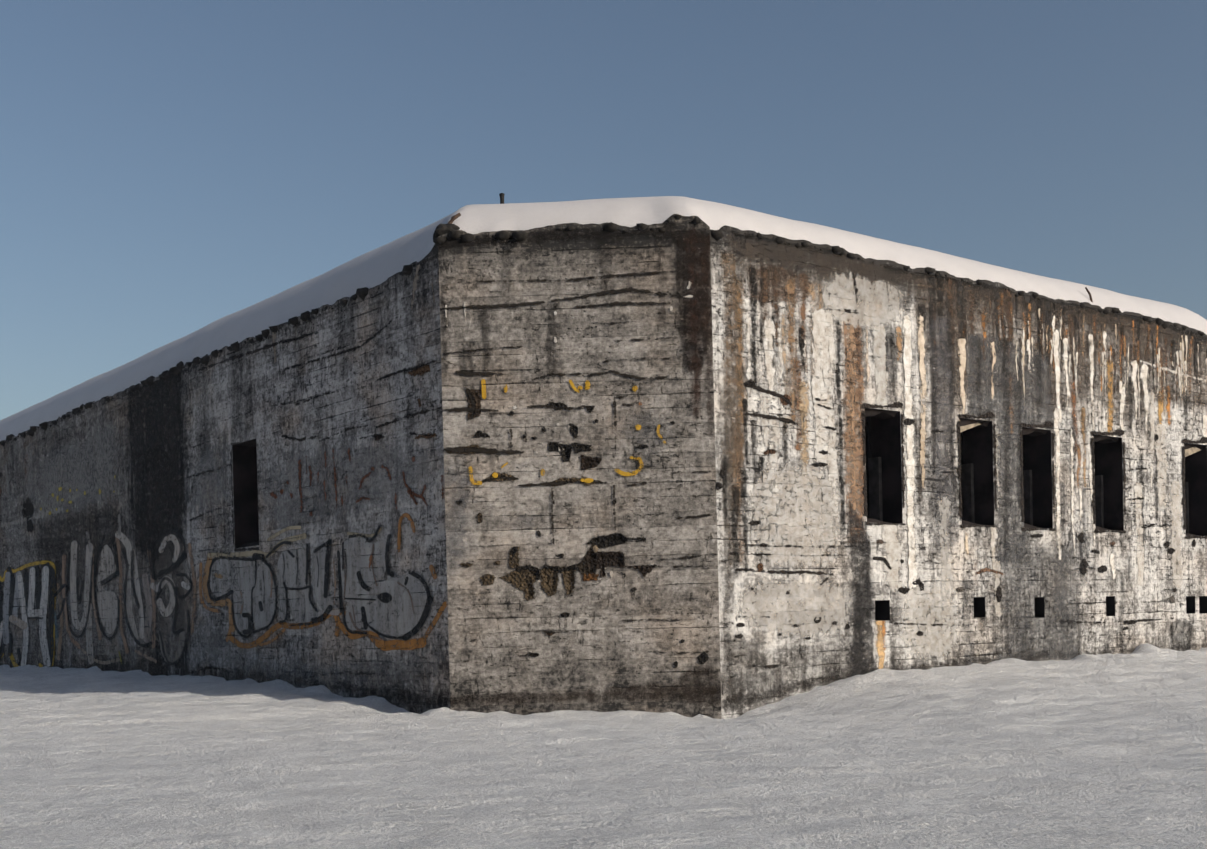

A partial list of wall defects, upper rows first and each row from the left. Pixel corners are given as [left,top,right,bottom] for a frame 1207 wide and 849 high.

leakage [0,371,198,676]
spalling [408,363,430,376]
spalling [444,389,490,455]
spalling [486,472,519,482]
spalling [460,533,657,601]
spalling [523,423,602,486]
leakage [215,221,1207,710]
corrosion [721,251,822,588]
corrosion [843,313,865,542]
corrosion [1072,382,1086,487]
corrosion [1023,303,1193,432]
corrosion [876,621,885,669]